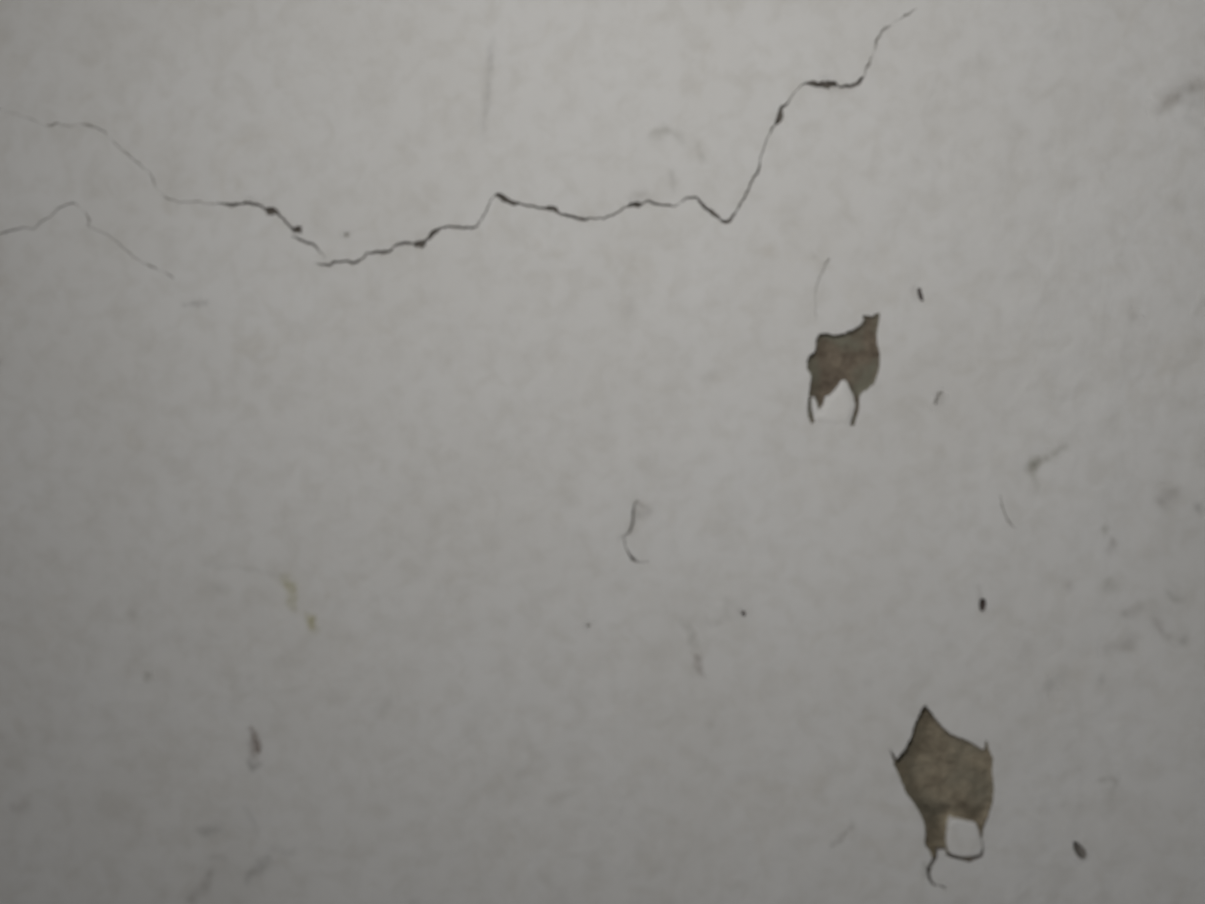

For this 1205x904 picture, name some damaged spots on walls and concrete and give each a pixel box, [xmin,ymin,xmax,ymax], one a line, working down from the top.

crack [2,9,916,267]
spalling [807,313,880,426]
crack [623,500,649,562]
spalling [890,705,994,890]